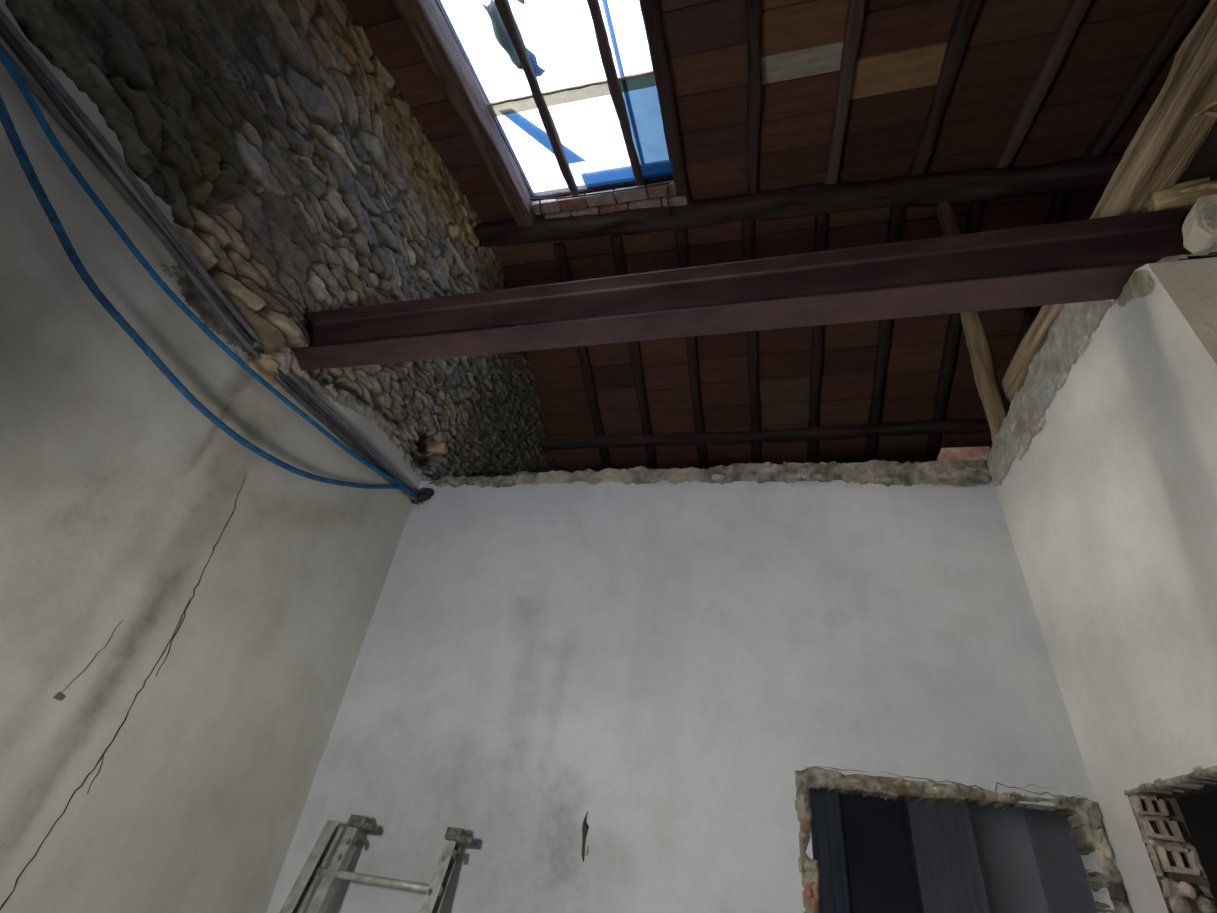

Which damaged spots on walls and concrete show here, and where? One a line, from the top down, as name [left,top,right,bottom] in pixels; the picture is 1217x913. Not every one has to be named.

crack [0,478,245,910]